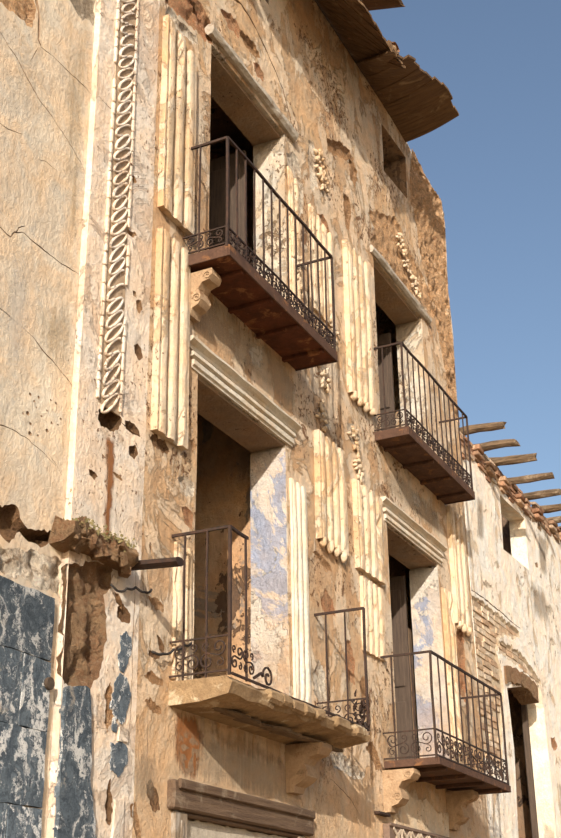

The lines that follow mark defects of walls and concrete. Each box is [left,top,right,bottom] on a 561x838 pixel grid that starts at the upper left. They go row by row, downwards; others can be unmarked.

spalling [165,0,212,45]
spalling [221,9,264,81]
crack [0,0,111,174]
crack [0,226,77,273]
crack [0,308,71,384]
spalling [98,407,169,459]
corrosion [103,439,114,536]
spalling [56,561,131,689]
spalling [104,682,129,743]
spalling [144,670,163,686]
spalling [456,629,467,702]
flaking render [471,595,541,769]